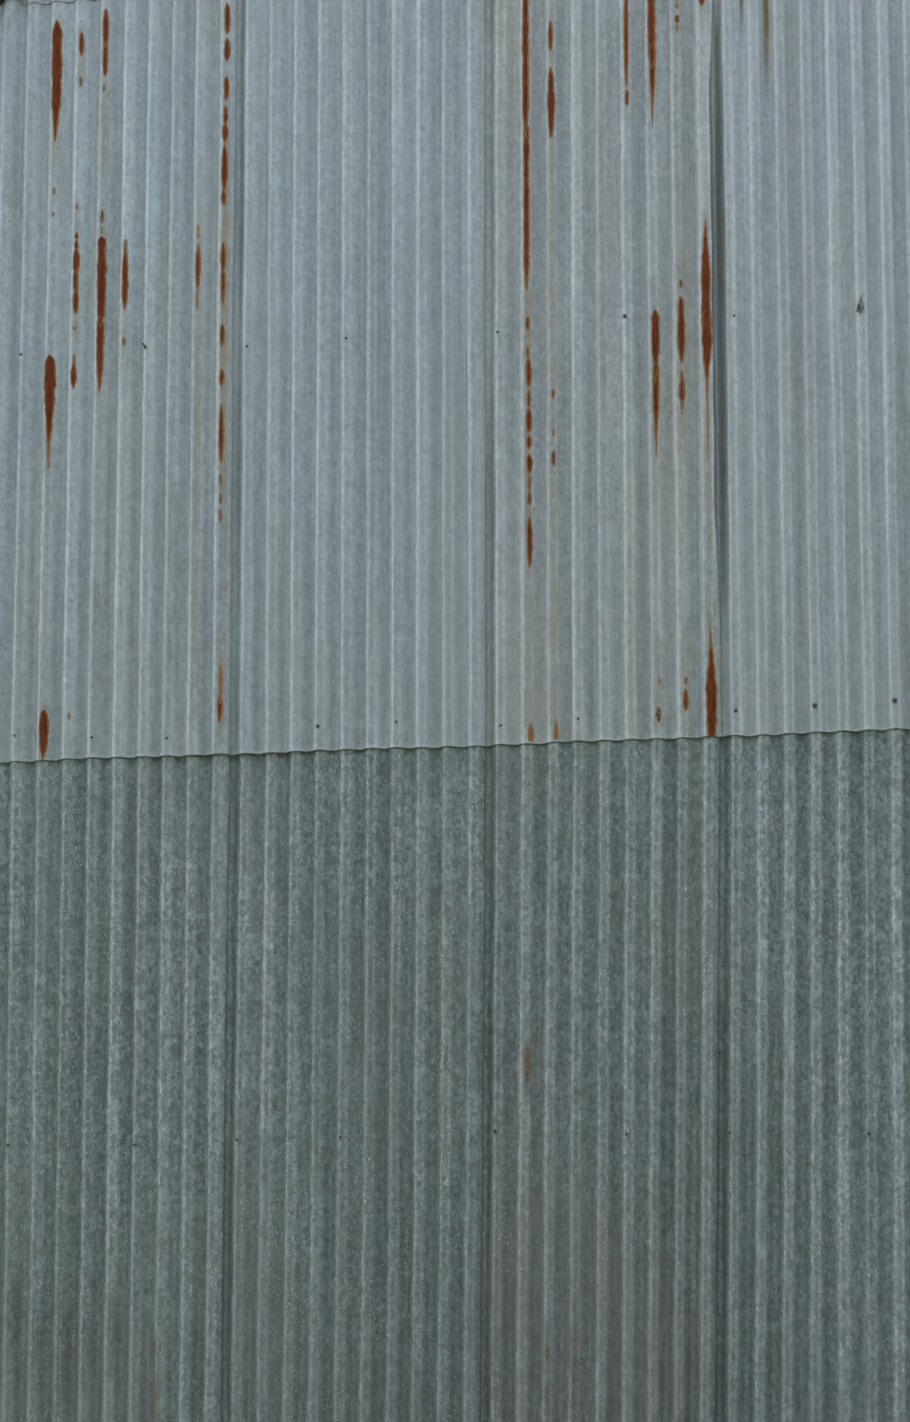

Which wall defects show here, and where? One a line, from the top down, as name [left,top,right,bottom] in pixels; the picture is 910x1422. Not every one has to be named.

rust [51,20,85,142]
rust [219,2,231,387]
rust [521,0,530,291]
rust [546,20,556,138]
rust [647,0,656,127]
rust [43,354,77,468]
rust [72,232,80,330]
rust [96,209,129,393]
rust [525,316,533,568]
rust [651,309,660,457]
rust [677,220,713,452]
rust [705,627,718,736]